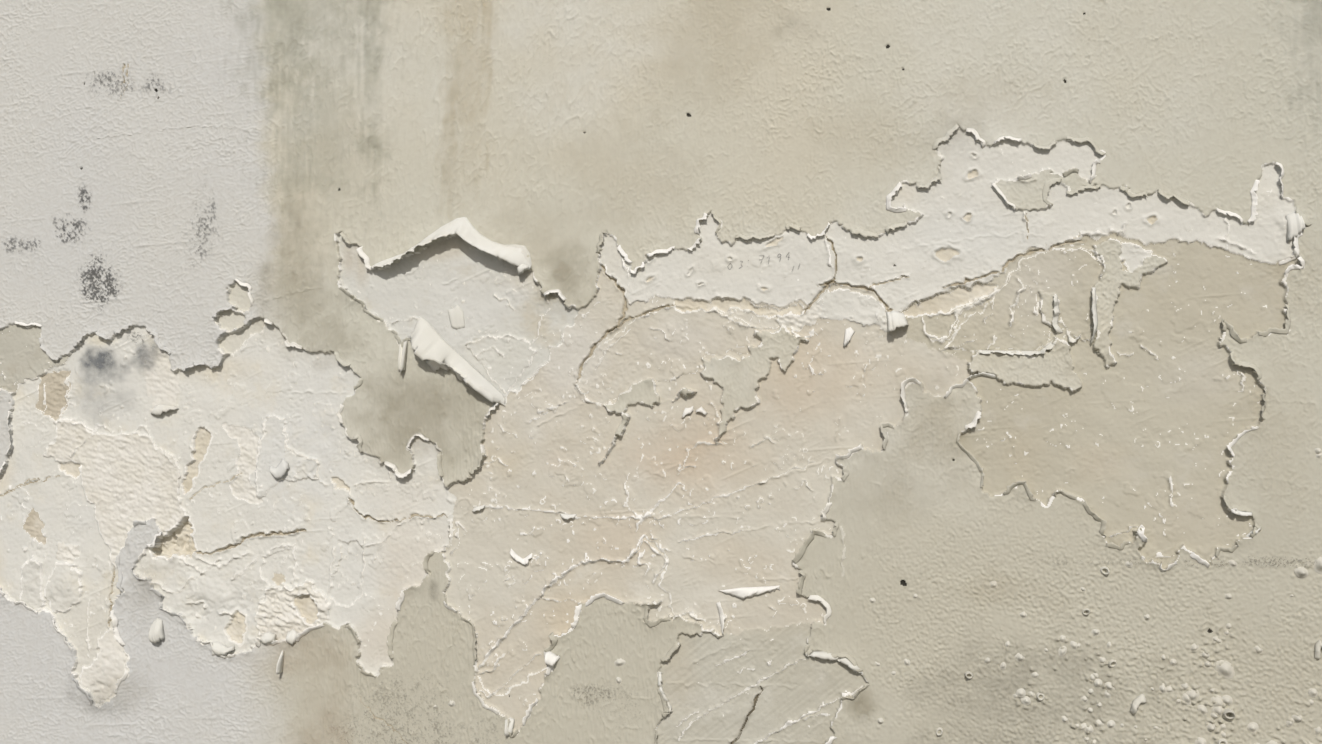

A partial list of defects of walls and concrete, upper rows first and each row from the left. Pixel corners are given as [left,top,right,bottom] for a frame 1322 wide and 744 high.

water stain [59,190,90,242]
mould [81,258,117,302]
crack [577,266,676,382]
peeling [334,123,1312,744]
peeling [0,278,457,709]
peeling [1314,640,1322,660]